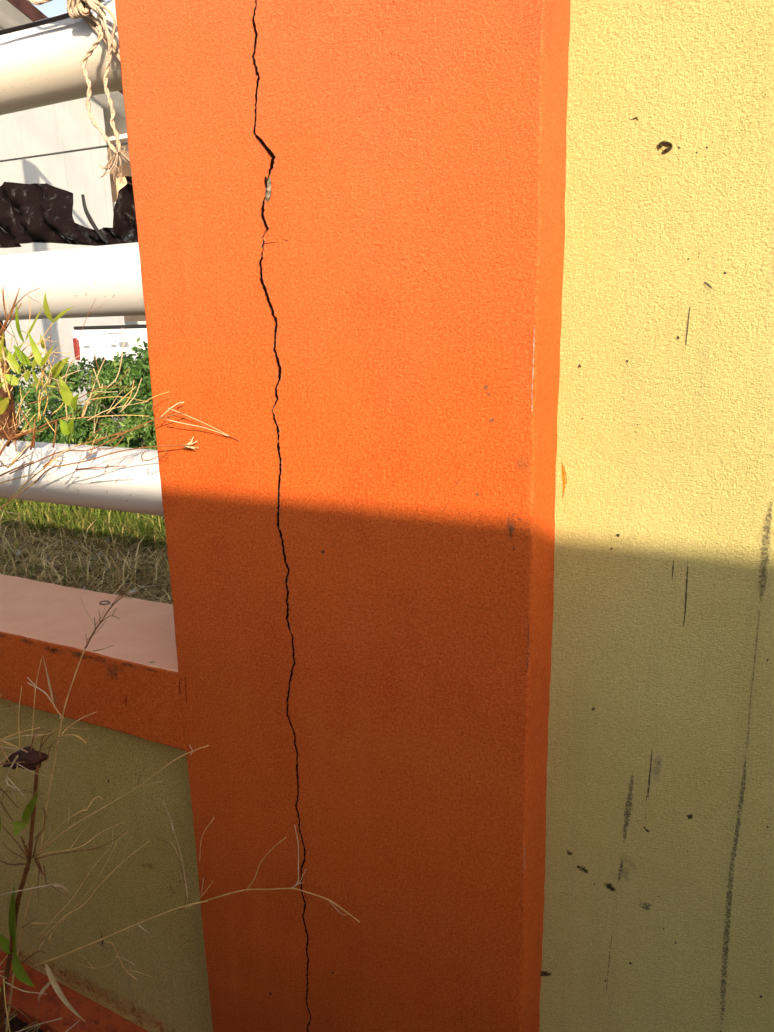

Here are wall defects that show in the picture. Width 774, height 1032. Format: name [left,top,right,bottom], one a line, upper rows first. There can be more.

crack [252,0,311,1032]